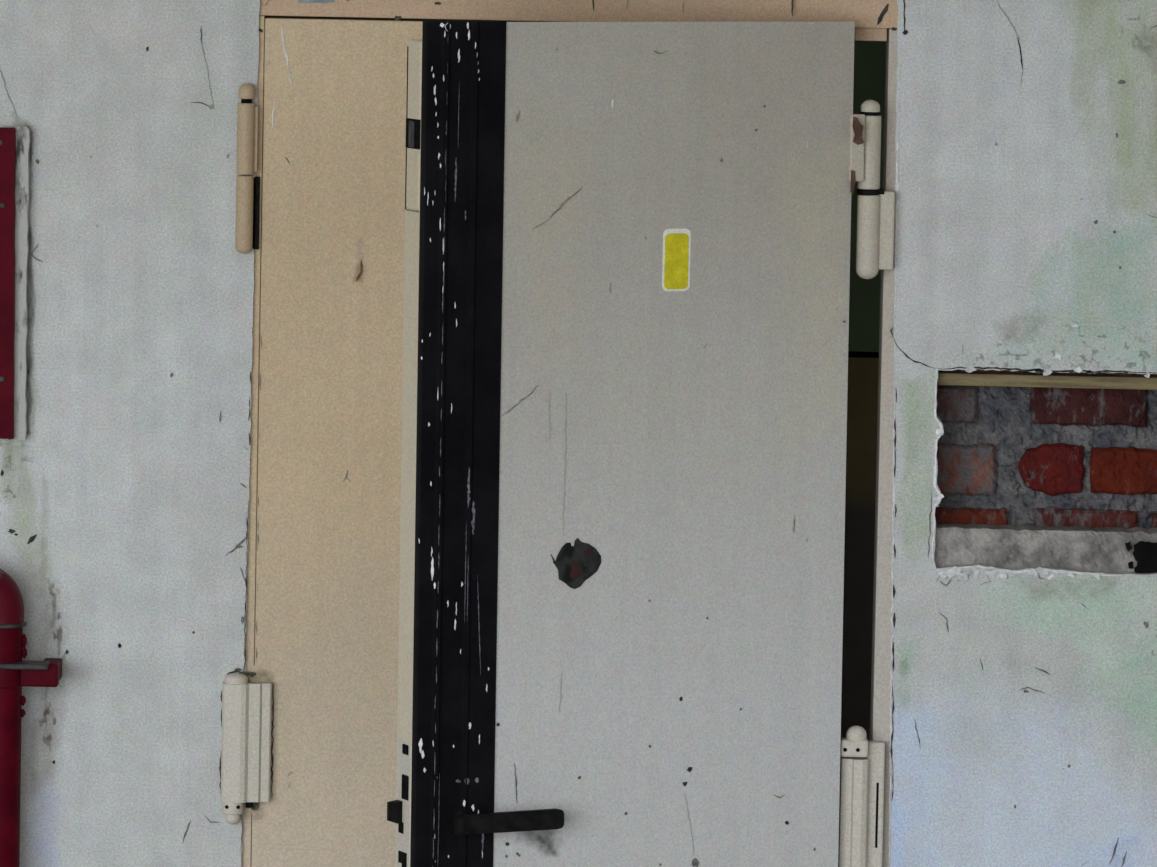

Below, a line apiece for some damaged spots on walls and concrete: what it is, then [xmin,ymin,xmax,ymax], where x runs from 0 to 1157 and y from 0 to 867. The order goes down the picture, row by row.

crack [997,1,1023,86]
water stain [0,70,63,657]
crack [890,328,933,368]
flaking render [928,354,1154,587]